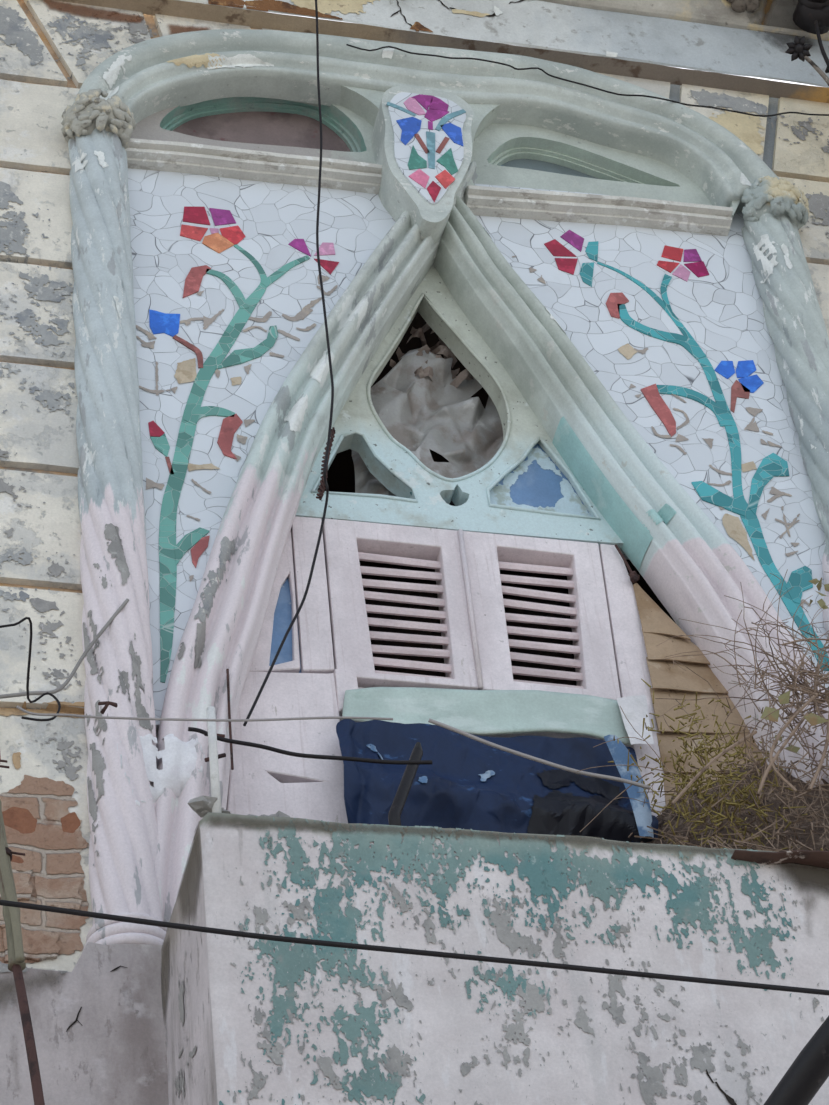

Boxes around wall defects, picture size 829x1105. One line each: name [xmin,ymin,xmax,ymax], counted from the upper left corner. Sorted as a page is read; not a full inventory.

peeling [0,6,161,100]
peeling [166,53,274,70]
peeling [0,181,77,419]
peeling [752,234,793,283]
peeling [0,448,46,508]
peeling [0,528,75,577]
peeling [0,587,104,689]
peeling [93,523,130,589]
peeling [116,633,153,732]
peeling [177,536,237,669]
flaking render [0,697,108,974]
peeling [219,816,801,1105]